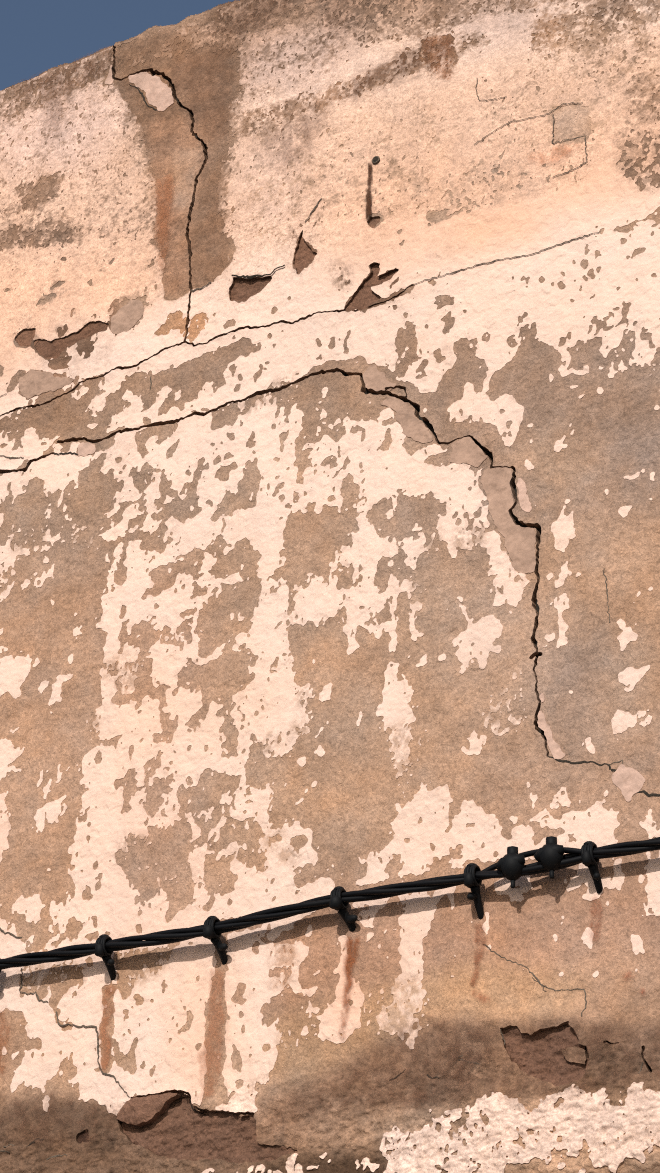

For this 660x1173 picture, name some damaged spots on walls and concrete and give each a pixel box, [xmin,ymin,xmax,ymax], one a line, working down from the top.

crack [412,231,601,285]
crack [342,373,441,444]
crack [475,441,493,462]
peeling [544,499,581,649]
peeling [438,596,503,674]
peeling [356,661,620,886]
crack [538,727,624,772]
peeling [564,809,660,916]
crack [19,968,129,1097]
peeling [0,886,456,1173]
corrosion [343,938,359,1025]
peeling [355,1024,660,1173]